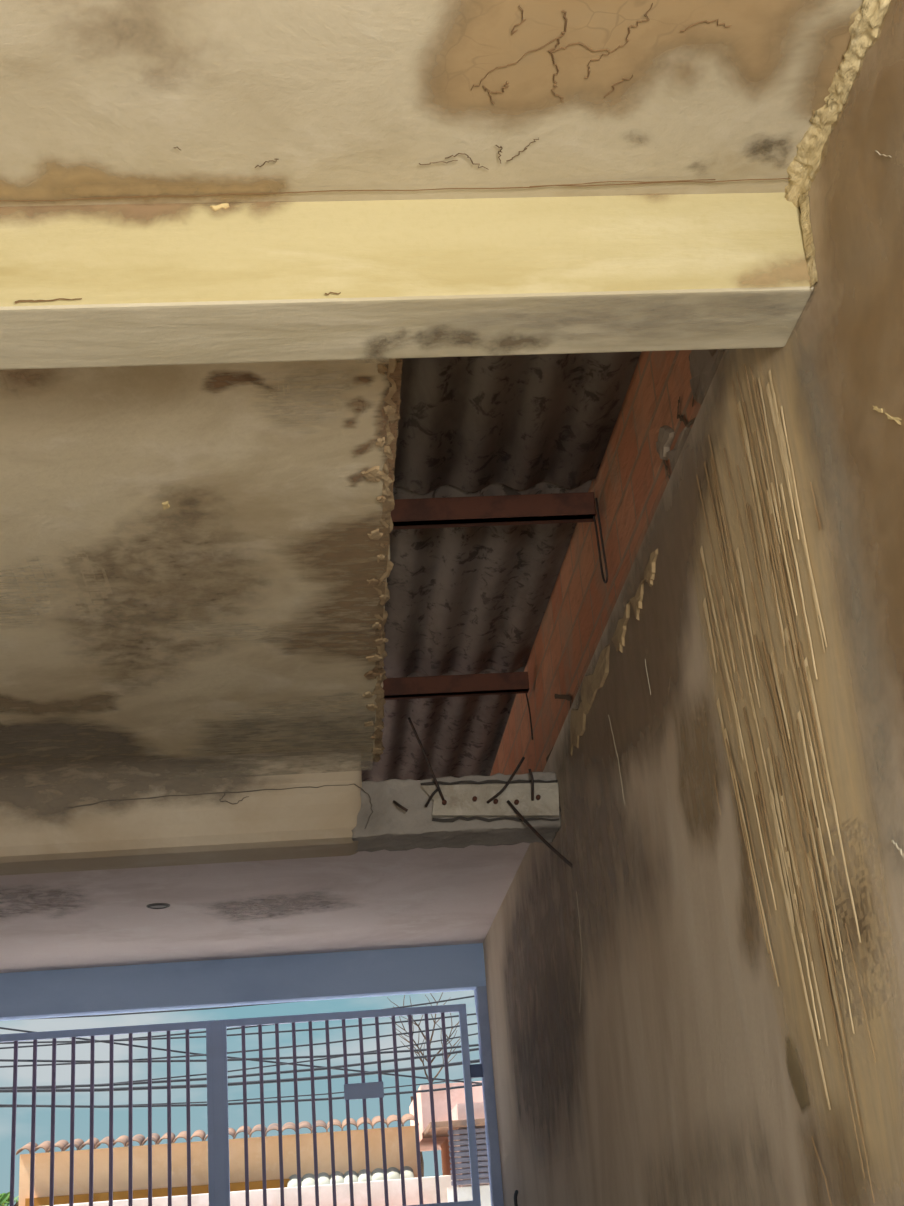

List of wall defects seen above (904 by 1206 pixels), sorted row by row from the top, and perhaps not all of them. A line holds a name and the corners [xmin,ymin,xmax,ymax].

crack [471,3,653,104]
water stain [427,0,814,118]
water stain [808,20,855,112]
water stain [741,259,811,286]
water stain [497,336,539,348]
water stain [819,0,904,704]
water stain [88,512,390,669]
spalling [347,358,403,762]
water stain [0,695,254,818]
spalling [421,780,561,822]
water stain [560,336,904,1206]
water stain [505,788,646,1141]